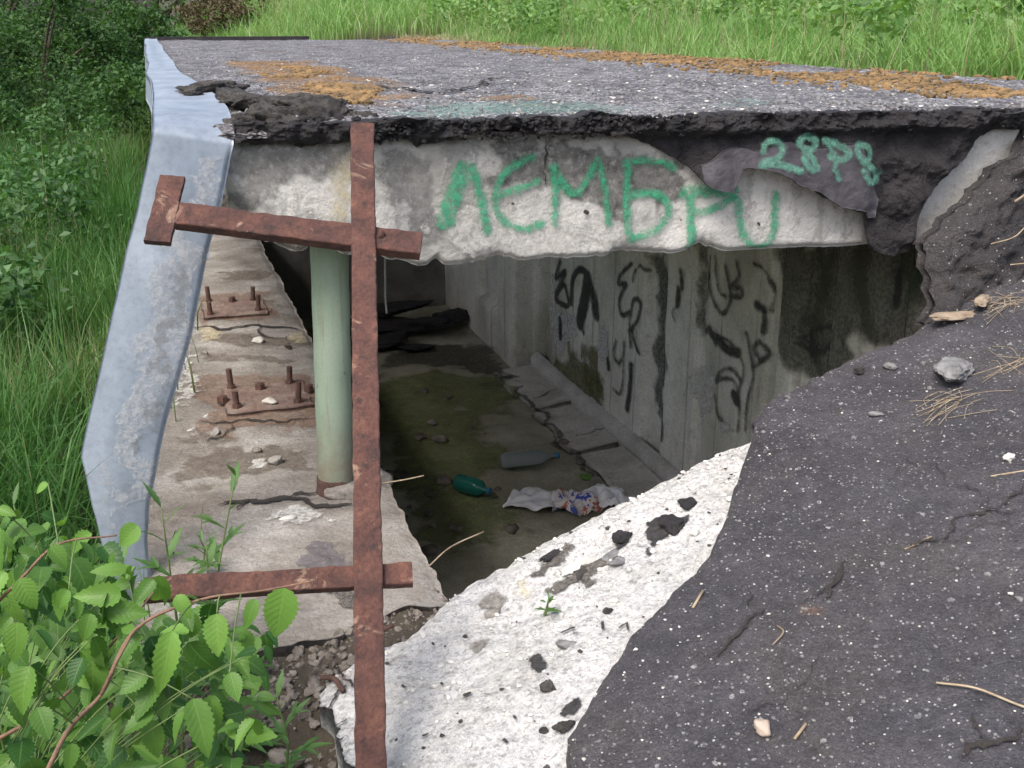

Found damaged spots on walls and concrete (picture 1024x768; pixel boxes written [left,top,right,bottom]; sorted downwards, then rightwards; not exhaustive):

crack [196,324,297,338]
leakage [651,255,668,441]
leakage [696,248,708,332]
leakage [777,244,927,378]
corrosion [190,374,316,436]
crack [504,376,603,477]
crack [218,491,352,510]